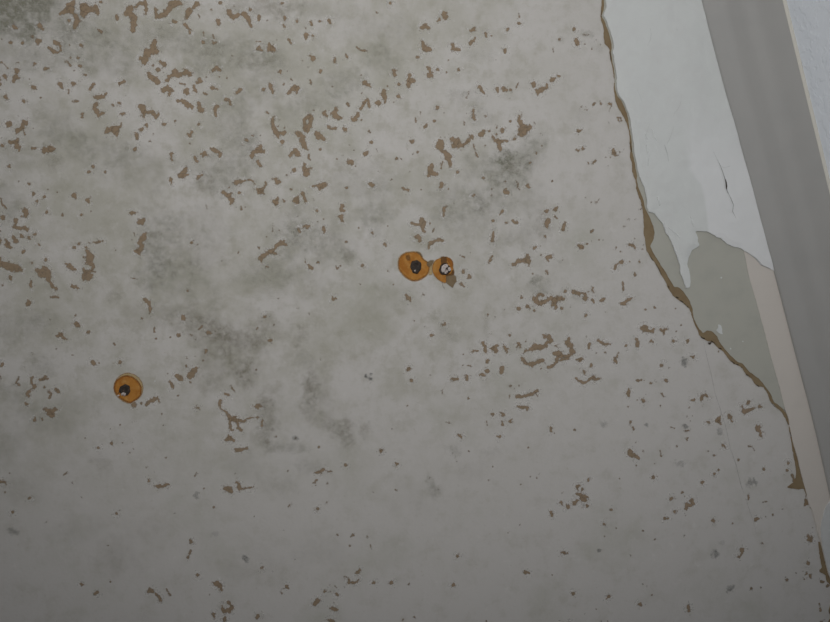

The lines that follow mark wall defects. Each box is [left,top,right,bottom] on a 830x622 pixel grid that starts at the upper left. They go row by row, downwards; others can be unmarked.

corrosion [398,252,457,288]
corrosion [114,373,143,403]
peeling [739,400,765,451]
peeling [663,491,695,520]